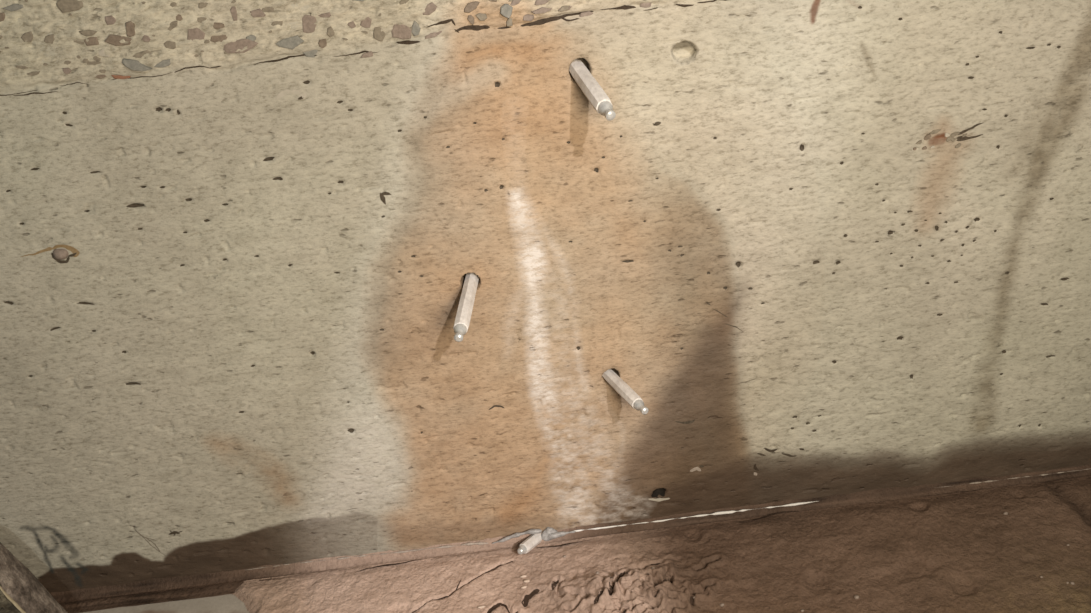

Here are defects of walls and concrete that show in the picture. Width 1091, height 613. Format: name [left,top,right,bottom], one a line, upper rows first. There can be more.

crack [254,0,726,65]
crack [0,66,221,96]
corrosion [907,111,984,241]
water stain [297,0,1091,532]
water stain [547,529,583,540]
crack [412,561,513,613]
crack [487,580,559,613]
crack [594,563,694,605]